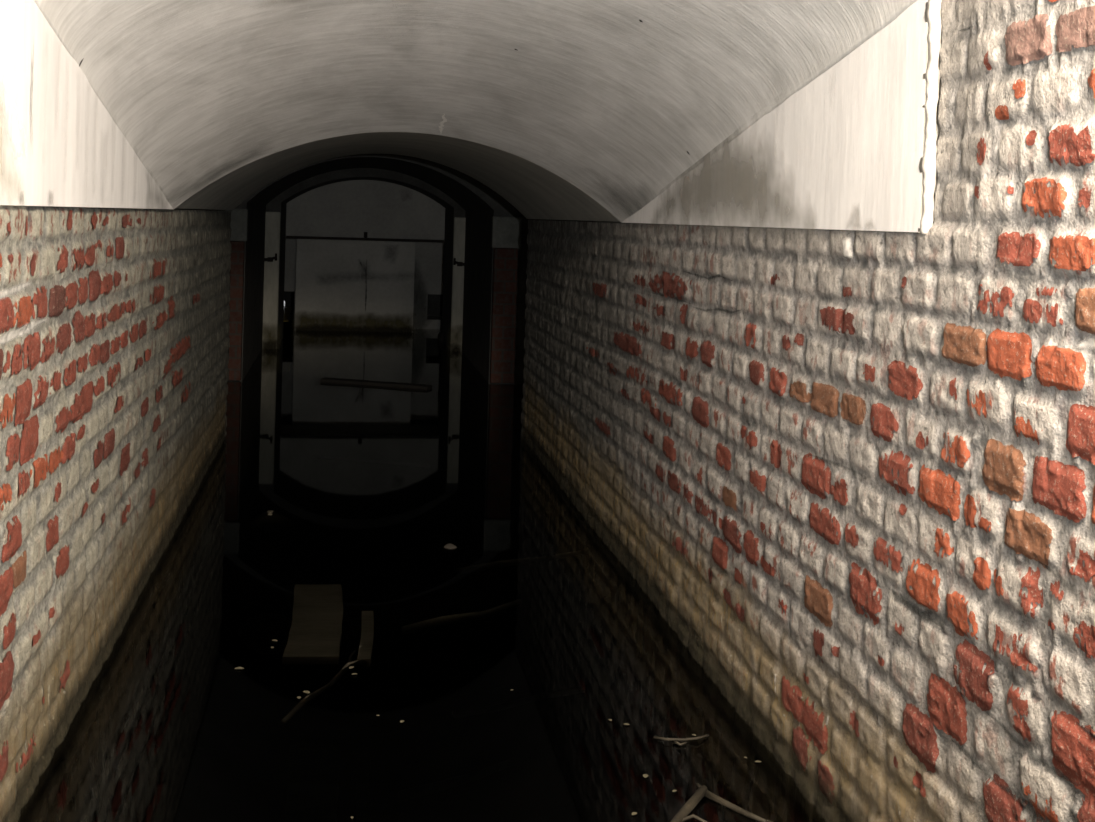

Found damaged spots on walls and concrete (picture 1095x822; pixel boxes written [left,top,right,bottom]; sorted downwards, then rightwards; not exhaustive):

peeling [1004,5,1095,66]
water stain [666,138,791,221]
peeling [1007,177,1090,218]
peeling [1026,124,1095,167]
peeling [996,232,1095,271]
peeling [942,284,1095,391]
peeling [0,212,191,710]
peeling [586,271,777,623]
peeling [801,452,859,548]
peeling [744,323,992,533]
peeling [873,404,1095,797]
peeling [1051,710,1095,822]